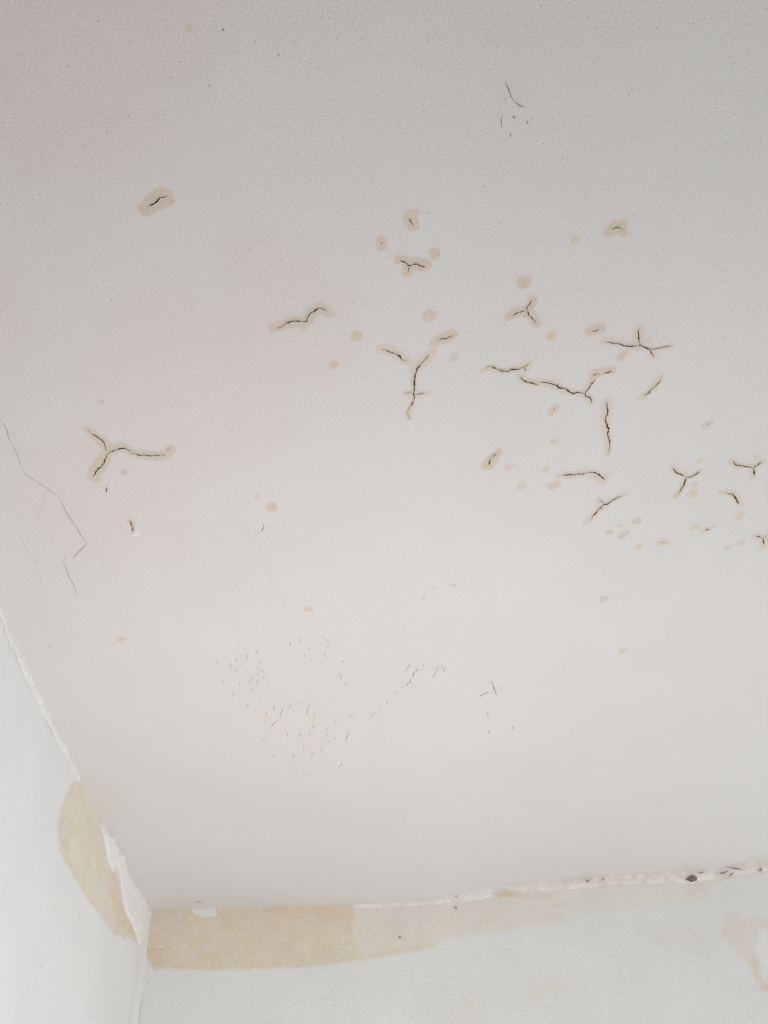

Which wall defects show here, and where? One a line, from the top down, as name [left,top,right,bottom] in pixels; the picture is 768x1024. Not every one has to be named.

leakage [56,780,716,973]
hole [682,872,704,884]
leakage [717,909,768,995]